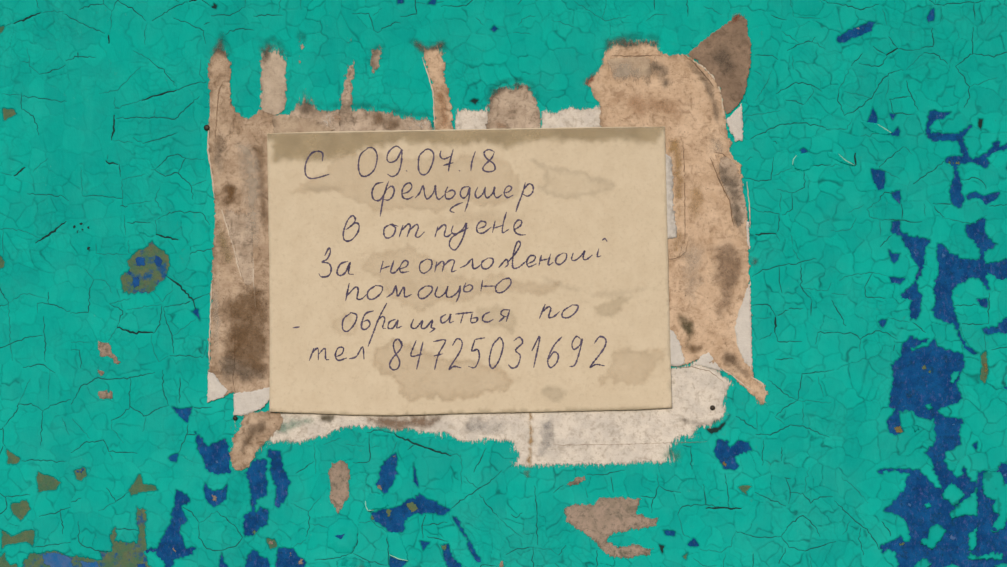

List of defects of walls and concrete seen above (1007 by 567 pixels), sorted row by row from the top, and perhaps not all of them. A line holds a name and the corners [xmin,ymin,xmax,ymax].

crack [356,0,483,33]
peeling [926,110,1007,208]
peeling [120,242,170,294]
crack [0,0,301,463]
crack [642,0,1007,567]
peeling [878,218,1007,567]
crack [36,489,129,552]
peeling [0,490,196,567]
crack [183,507,243,551]
peeling [243,450,290,536]
peeling [365,453,481,567]
crack [294,429,621,567]